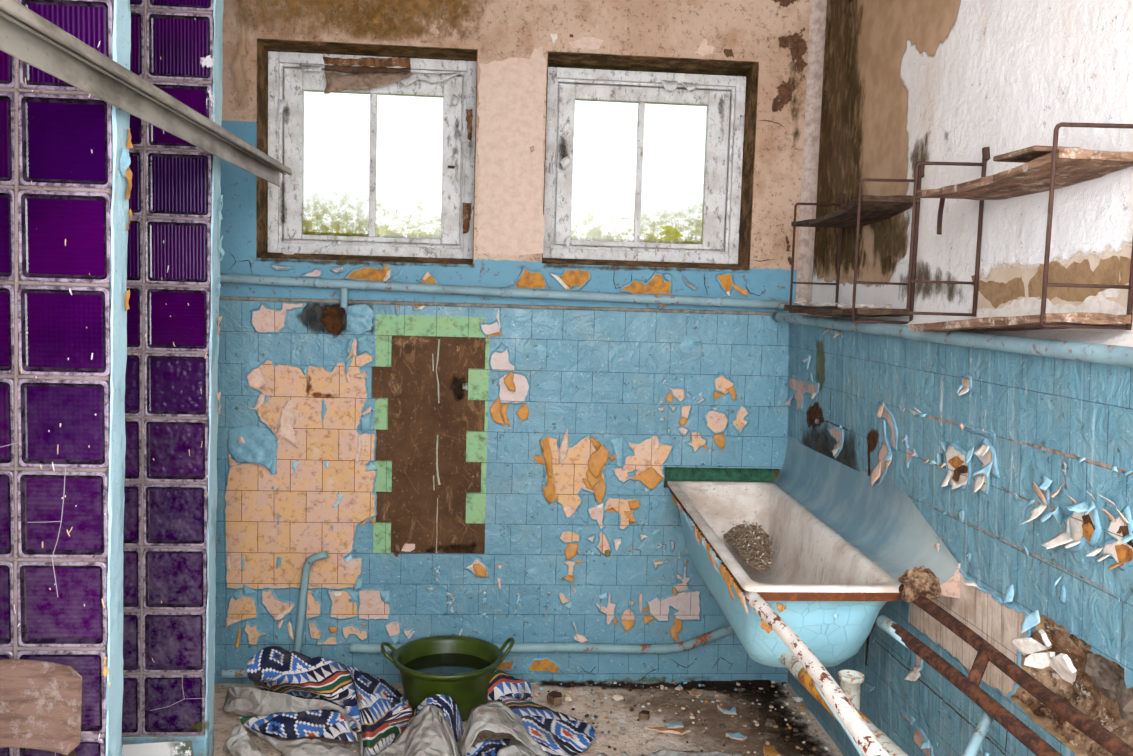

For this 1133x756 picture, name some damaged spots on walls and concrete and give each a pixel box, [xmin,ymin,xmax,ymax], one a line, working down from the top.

water stain [231,0,477,105]
water stain [772,28,808,116]
water stain [813,0,961,301]
water stain [977,263,1083,309]
flaking render [967,256,1133,334]
water stain [1053,244,1132,307]
peeling [223,336,415,648]
peeling [533,372,757,643]
spalling [937,423,1000,495]
spalling [1020,475,1133,570]
rust [798,667,837,719]
spalling [904,552,1133,756]